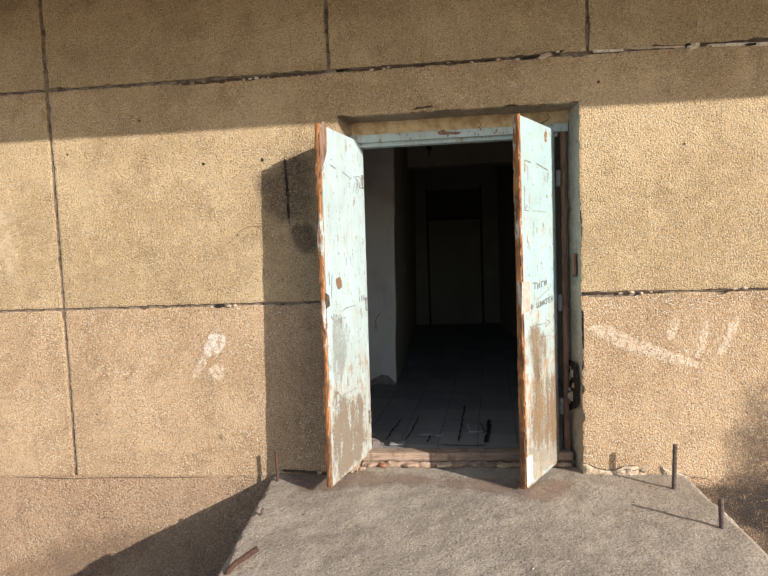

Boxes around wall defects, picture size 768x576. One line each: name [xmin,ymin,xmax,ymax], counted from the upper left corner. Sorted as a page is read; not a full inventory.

water stain [696,486,768,532]